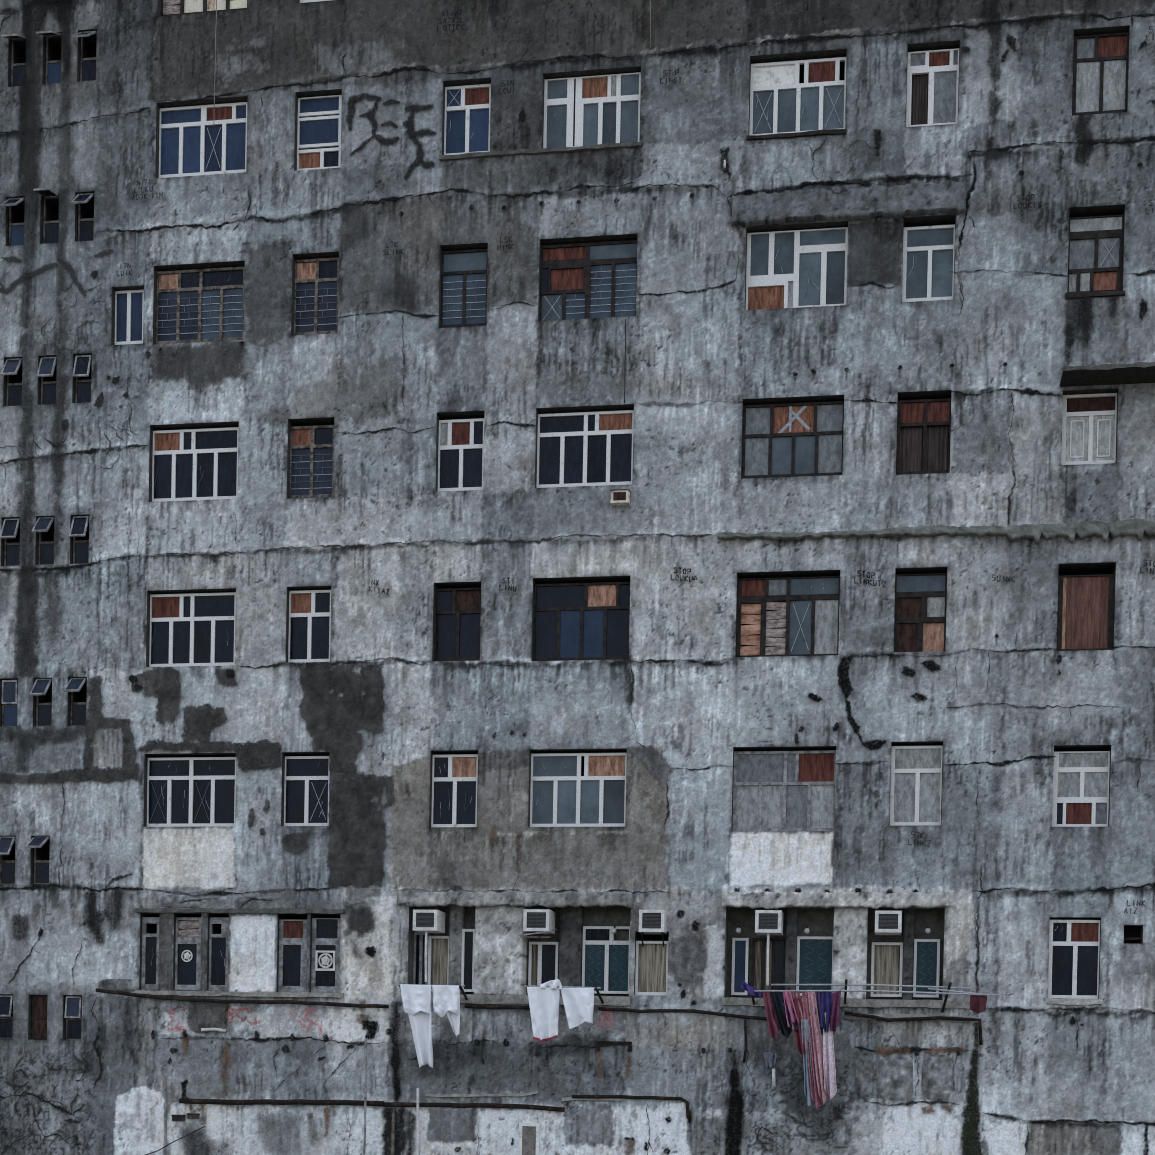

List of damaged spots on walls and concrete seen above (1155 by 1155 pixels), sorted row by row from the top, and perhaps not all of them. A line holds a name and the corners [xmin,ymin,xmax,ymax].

leakage [981,0,1002,145]
leakage [0,0,72,677]
leakage [961,1012,988,1155]